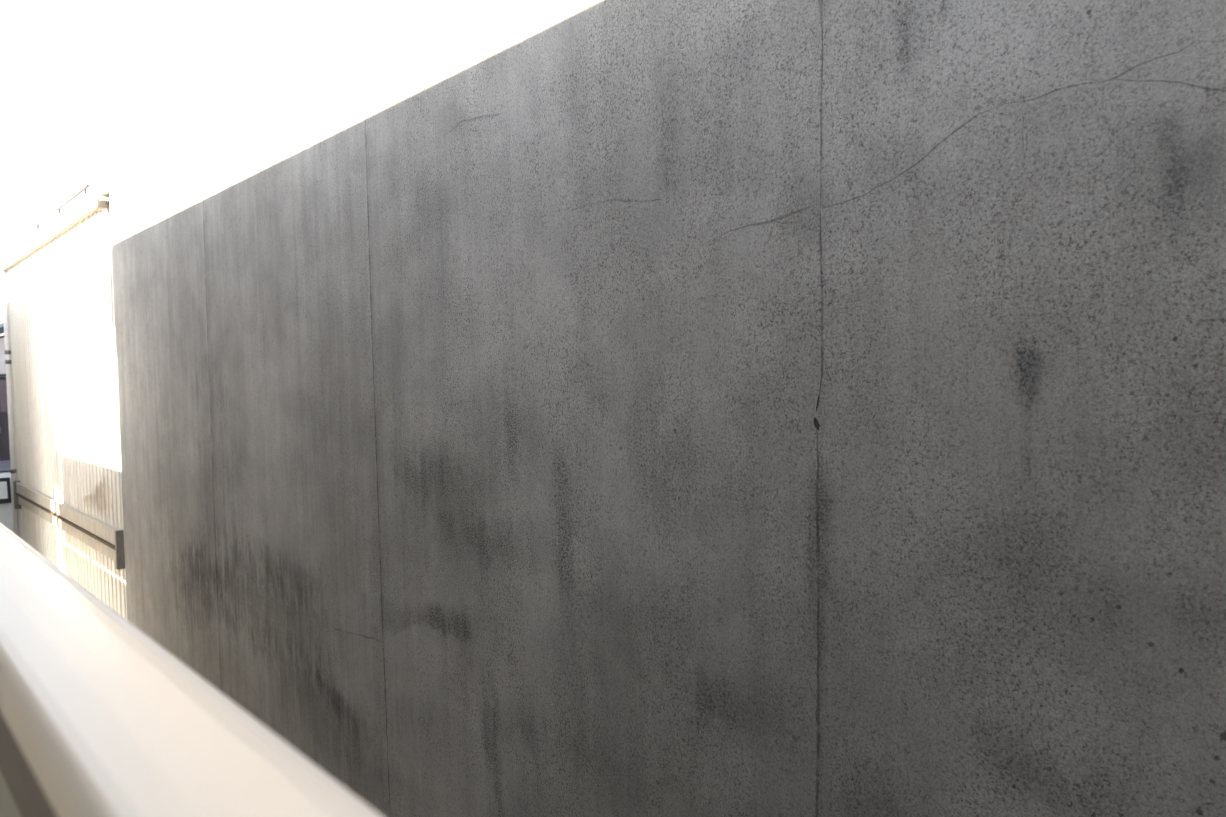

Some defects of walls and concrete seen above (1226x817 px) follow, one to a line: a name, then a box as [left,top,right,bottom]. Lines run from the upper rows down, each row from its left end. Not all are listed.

crack [820,196,860,321]
crack [813,433,821,550]
crack [814,590,822,817]